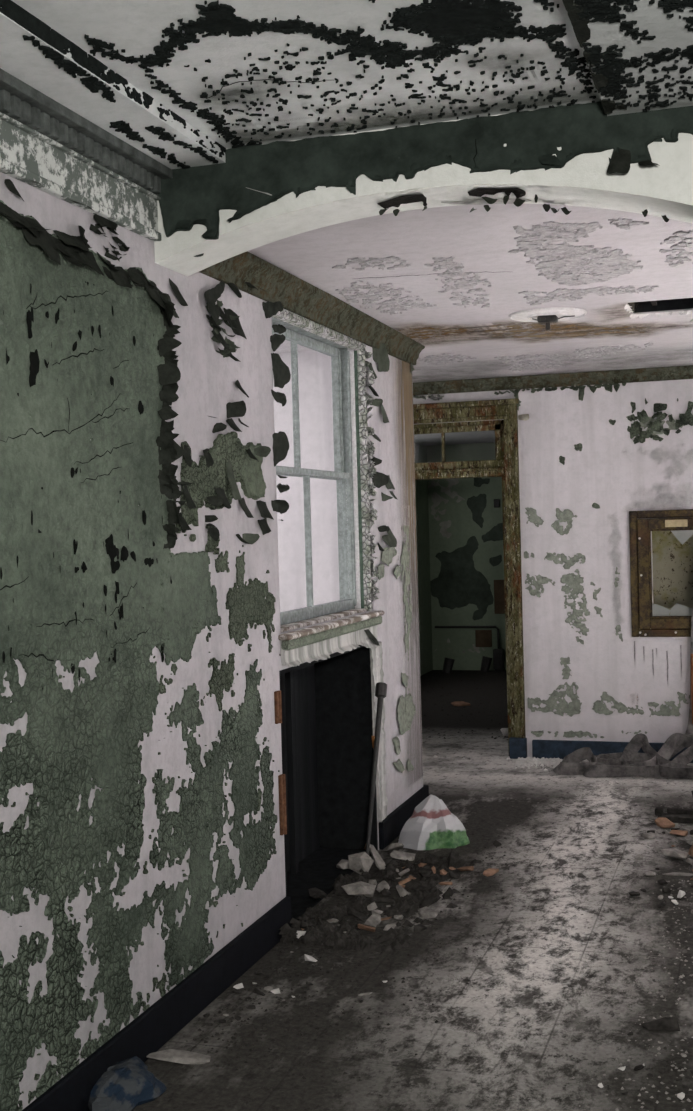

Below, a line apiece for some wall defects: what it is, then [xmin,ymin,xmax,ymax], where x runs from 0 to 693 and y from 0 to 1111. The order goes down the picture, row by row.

peeling [0,0,693,257]
crack [26,291,108,309]
peeling [441,188,693,322]
crack [1,348,129,442]
crack [74,442,133,483]
peeling [609,398,693,444]
peeling [430,478,503,620]
peeling [525,507,577,535]
crack [19,583,137,661]
peeling [0,179,416,1111]
peeling [524,551,603,644]
peeling [528,657,690,738]